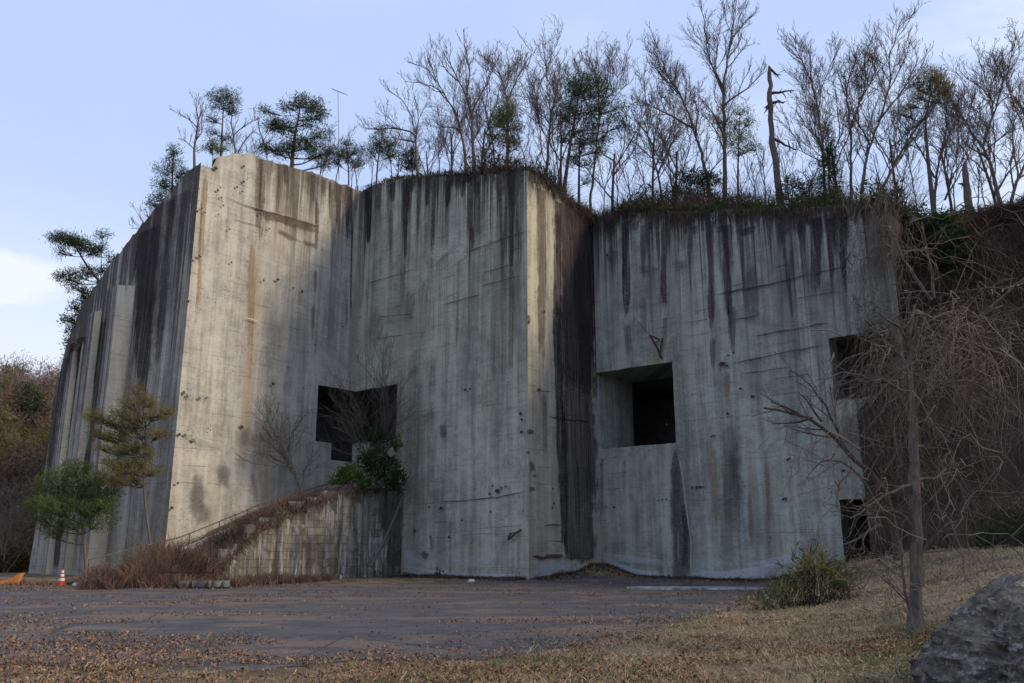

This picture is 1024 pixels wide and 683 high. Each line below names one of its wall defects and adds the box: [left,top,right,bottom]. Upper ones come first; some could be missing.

leakage [83,291,108,484]
leakage [124,194,185,395]
leakage [390,165,483,258]
leakage [495,171,514,354]
leakage [537,180,667,562]
leakage [693,222,755,363]
leakage [797,211,860,299]
leakage [191,480,205,512]